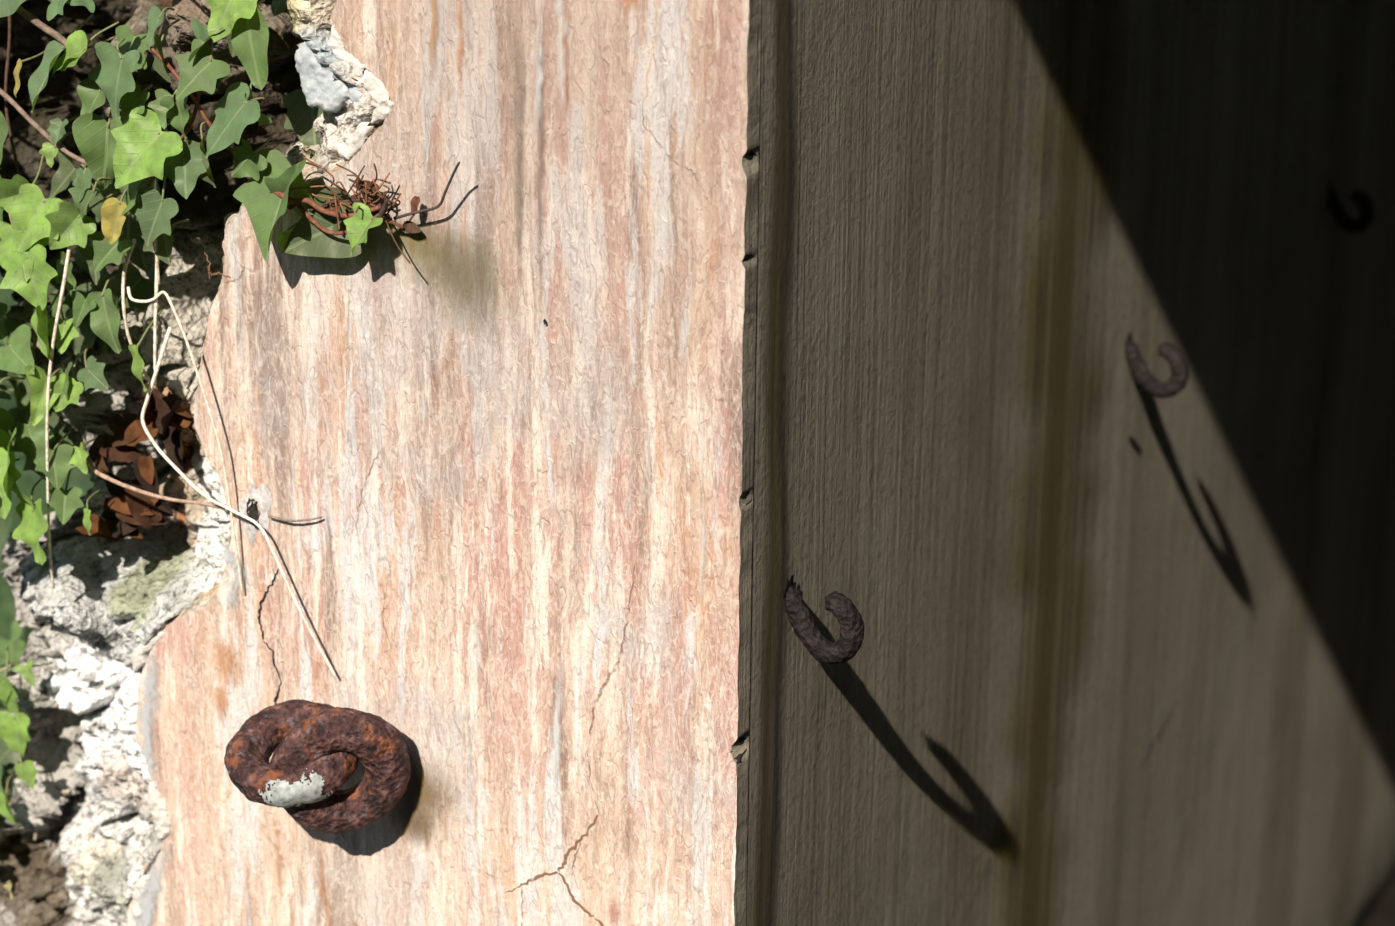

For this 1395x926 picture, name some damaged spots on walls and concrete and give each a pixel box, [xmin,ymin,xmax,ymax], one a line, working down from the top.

flaking render [295,25,394,161]
spalling [237,477,272,545]
flaking render [130,629,165,673]
crack [257,569,281,705]
crack [589,566,635,731]
flaking render [128,873,150,926]
flaking render [144,780,171,840]
crack [469,765,604,926]